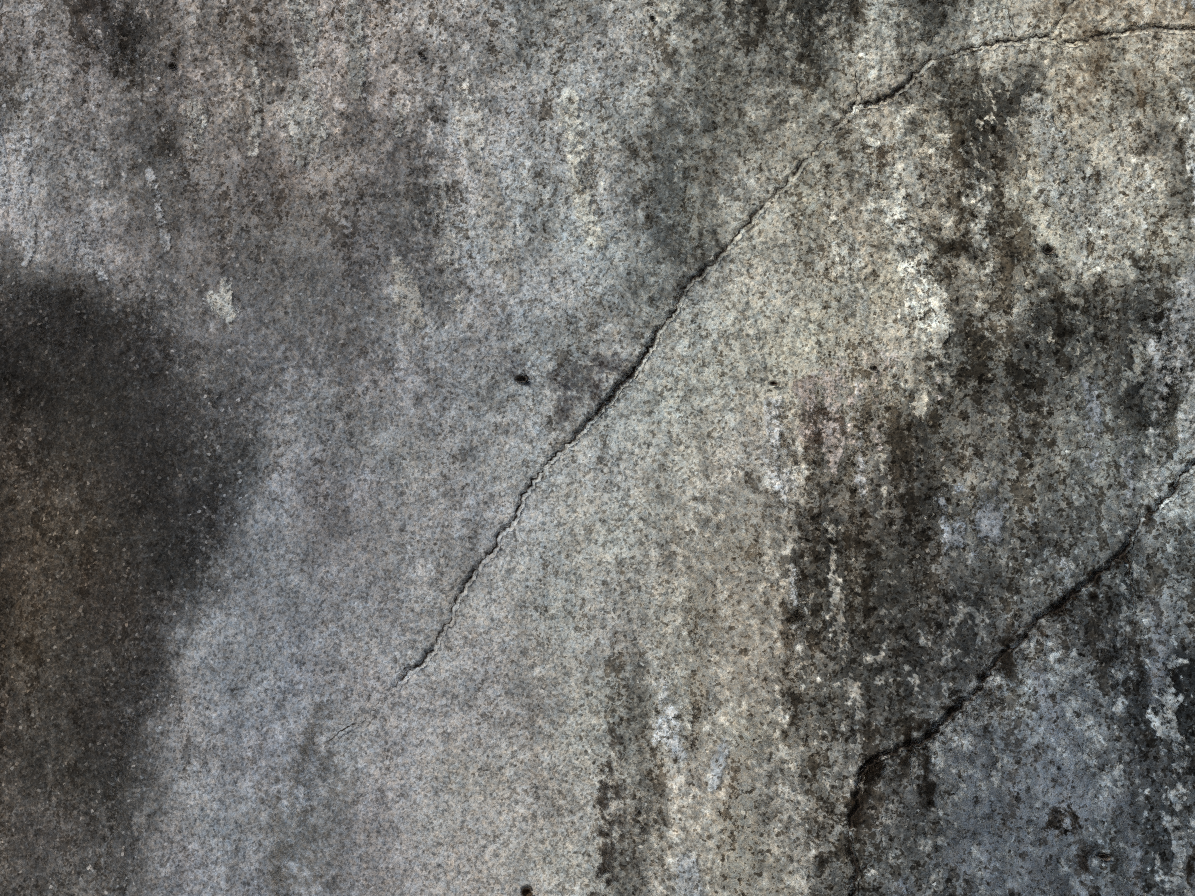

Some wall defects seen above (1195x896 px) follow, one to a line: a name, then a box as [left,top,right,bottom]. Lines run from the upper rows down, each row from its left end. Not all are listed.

leakage [450,76,520,295]
leakage [558,89,606,247]
leakage [661,0,685,19]
leakage [702,0,957,123]
leakage [1041,0,1195,112]
leakage [0,0,463,896]
leakage [553,356,625,421]
crack [328,0,1195,742]
leakage [587,45,1195,896]
crack [837,461,1195,896]